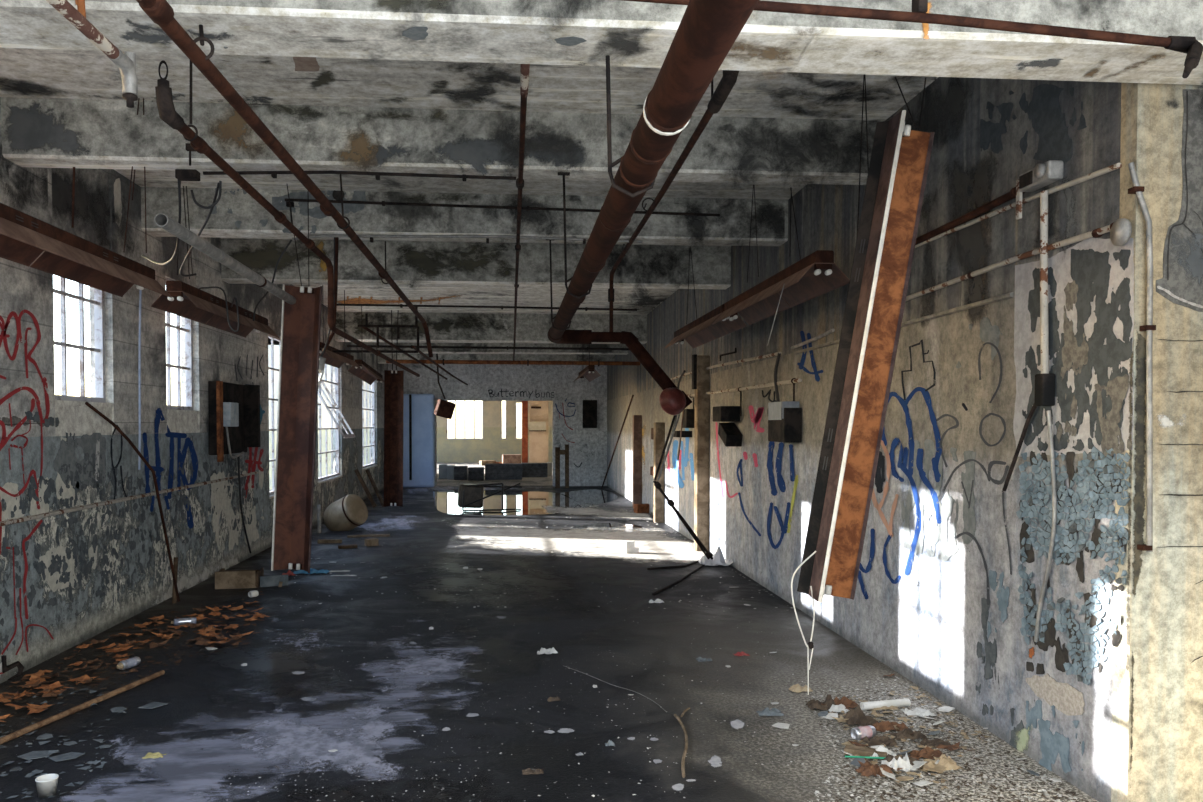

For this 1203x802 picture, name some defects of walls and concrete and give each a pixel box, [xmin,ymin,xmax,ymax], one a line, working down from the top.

leakage [0,78,134,253]
leakage [122,20,172,45]
leakage [210,96,322,157]
leakage [339,63,586,176]
leakage [396,193,574,288]
leakage [591,28,650,60]
leakage [603,42,971,312]
leakage [920,155,998,326]
leakage [1017,59,1062,71]
leakage [1036,177,1077,253]
peeling [0,411,264,654]
peeling [975,238,1134,773]